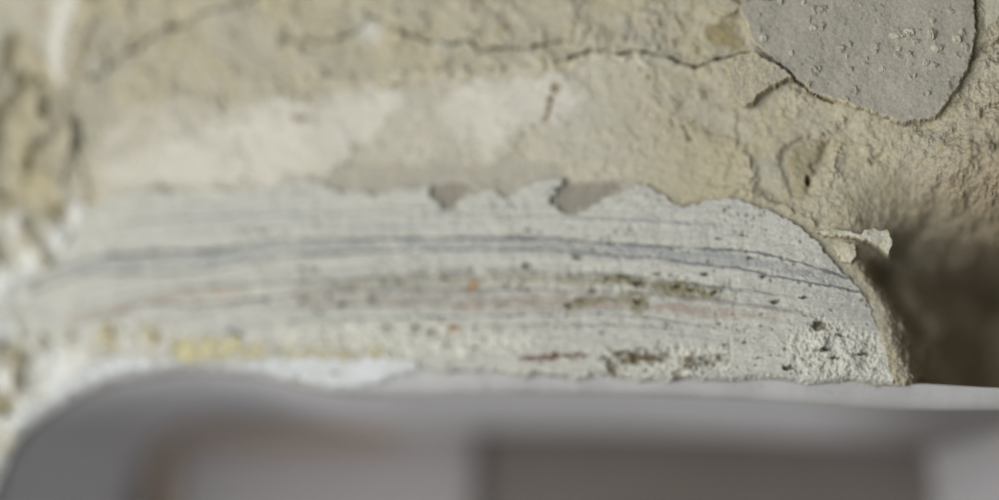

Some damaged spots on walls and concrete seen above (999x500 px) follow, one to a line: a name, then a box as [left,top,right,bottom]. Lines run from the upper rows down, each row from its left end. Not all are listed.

crack [390,31,750,70]
crack [793,77,834,104]
peeling [518,178,563,198]
flaking render [810,228,894,266]